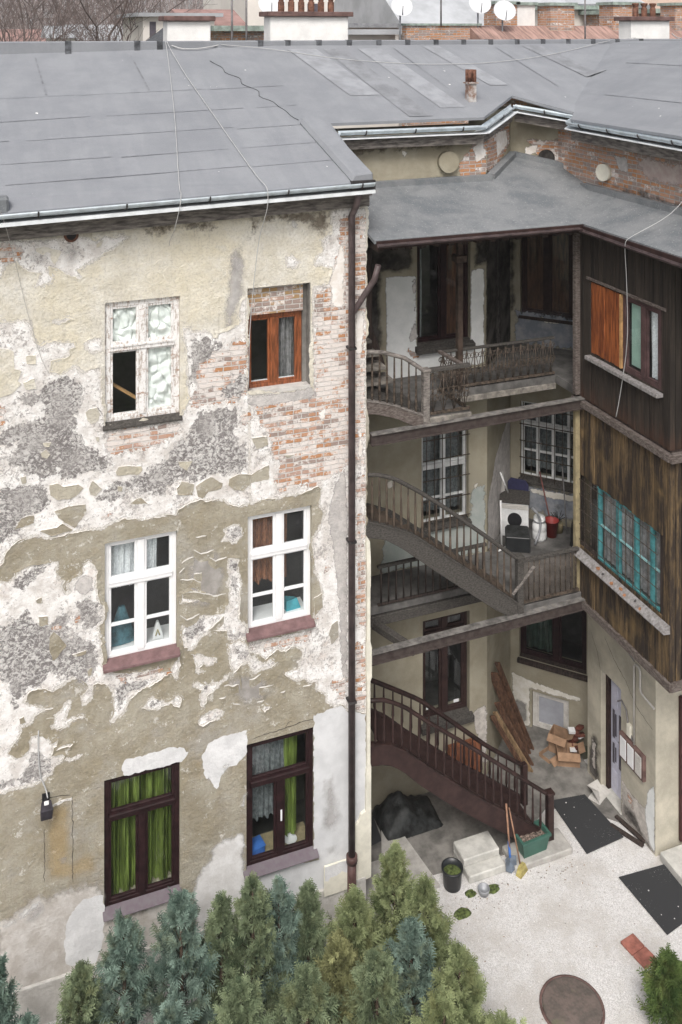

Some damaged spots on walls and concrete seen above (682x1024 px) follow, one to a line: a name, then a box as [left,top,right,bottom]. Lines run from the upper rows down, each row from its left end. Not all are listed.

crack [211,61,298,120]
flaking render [459,124,510,176]
flaking render [525,139,558,161]
flaking render [0,206,370,795]